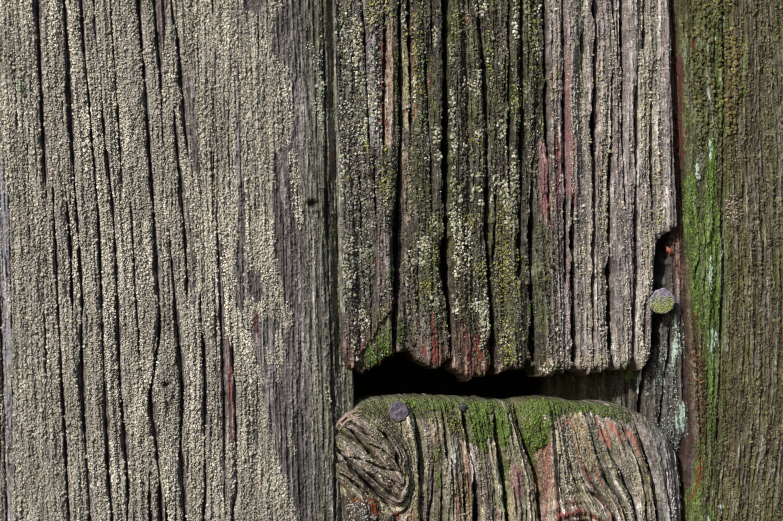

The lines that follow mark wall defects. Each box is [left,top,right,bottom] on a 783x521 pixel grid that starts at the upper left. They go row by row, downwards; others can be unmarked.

crack [35,0,237,521]
crack [313,0,540,521]
crack [483,0,654,368]
crack [588,425,683,521]
crack [658,311,683,426]